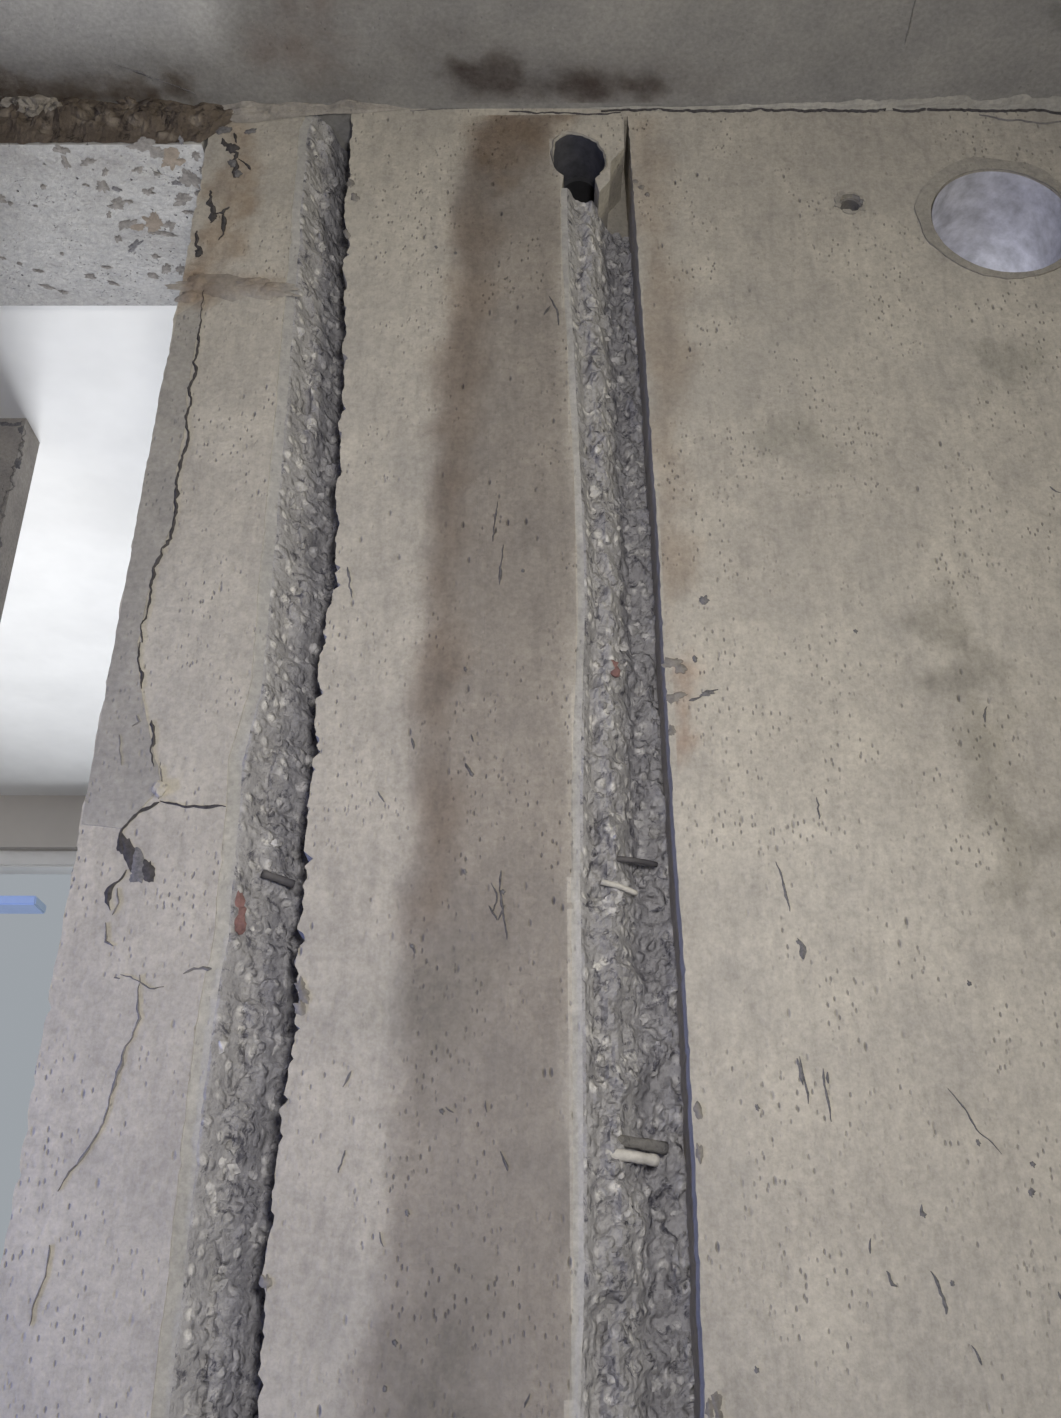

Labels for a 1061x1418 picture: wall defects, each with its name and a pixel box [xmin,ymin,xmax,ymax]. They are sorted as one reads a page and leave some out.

crack [509,94,1061,124]
crack [58,290,226,1191]
crack [29,1245,51,1326]